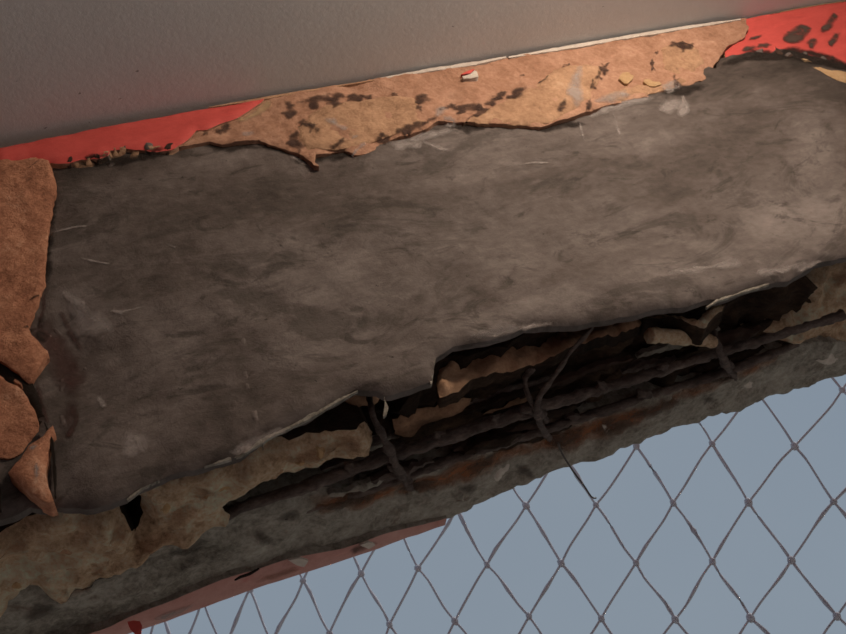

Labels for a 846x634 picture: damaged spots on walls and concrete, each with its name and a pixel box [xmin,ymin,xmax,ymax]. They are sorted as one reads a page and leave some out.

peeling [169,18,749,171]
flaking render [803,59,846,83]
crack [0,363,57,499]
spalling [0,157,846,617]
corrosion [321,396,678,510]